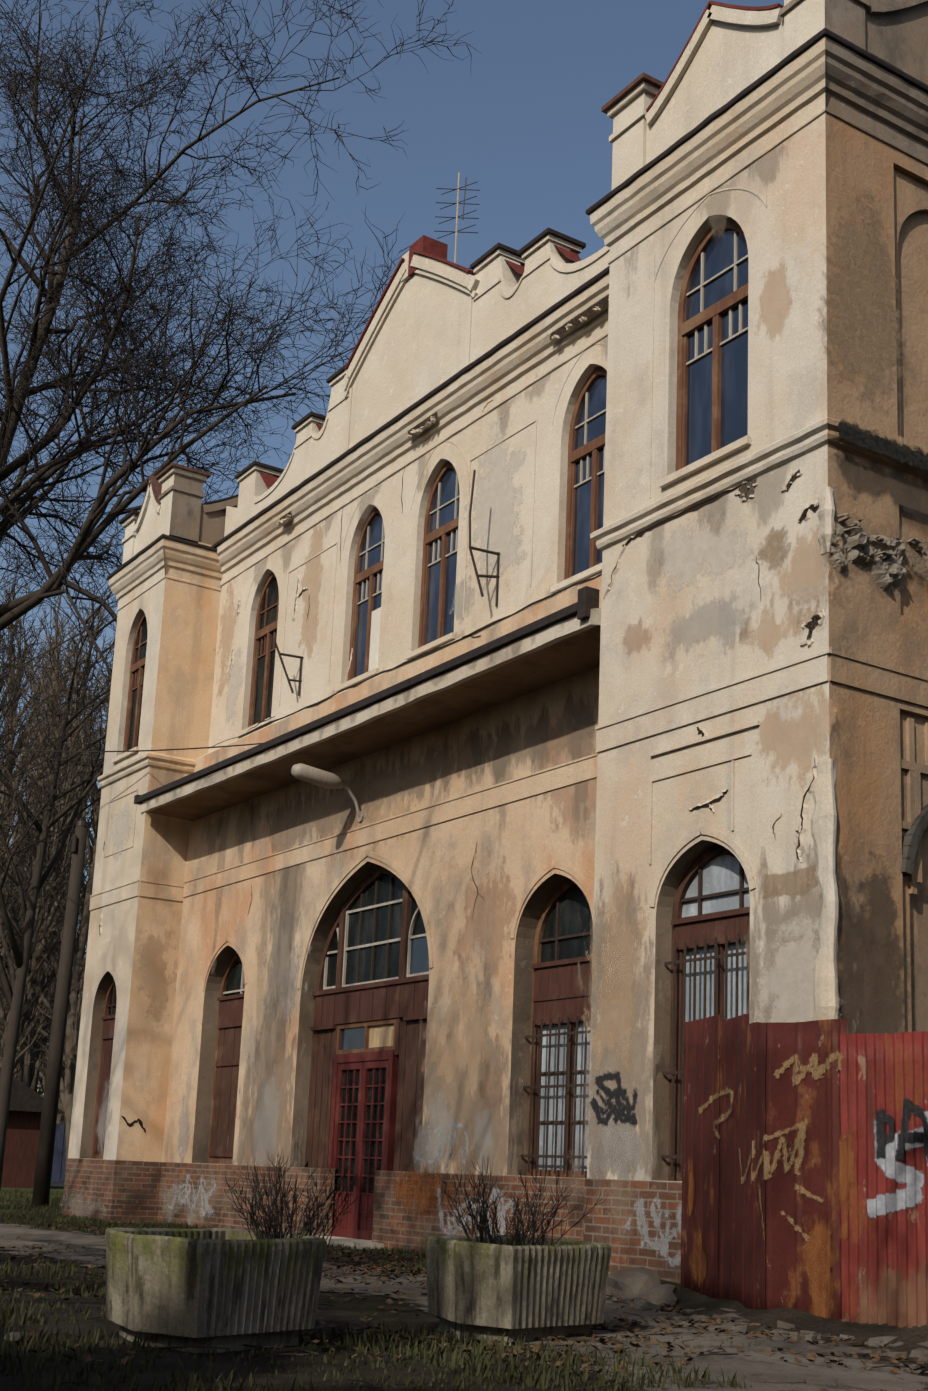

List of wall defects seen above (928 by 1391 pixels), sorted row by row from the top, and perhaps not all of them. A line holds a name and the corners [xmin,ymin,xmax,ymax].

spalling [734,478,759,502]
spalling [781,470,803,492]
spalling [822,511,928,596]
spalling [800,610,825,648]
crack [689,789,728,813]
crack [772,755,818,863]
corrosion [688,1159,707,1287]
corrosion [802,1131,928,1328]